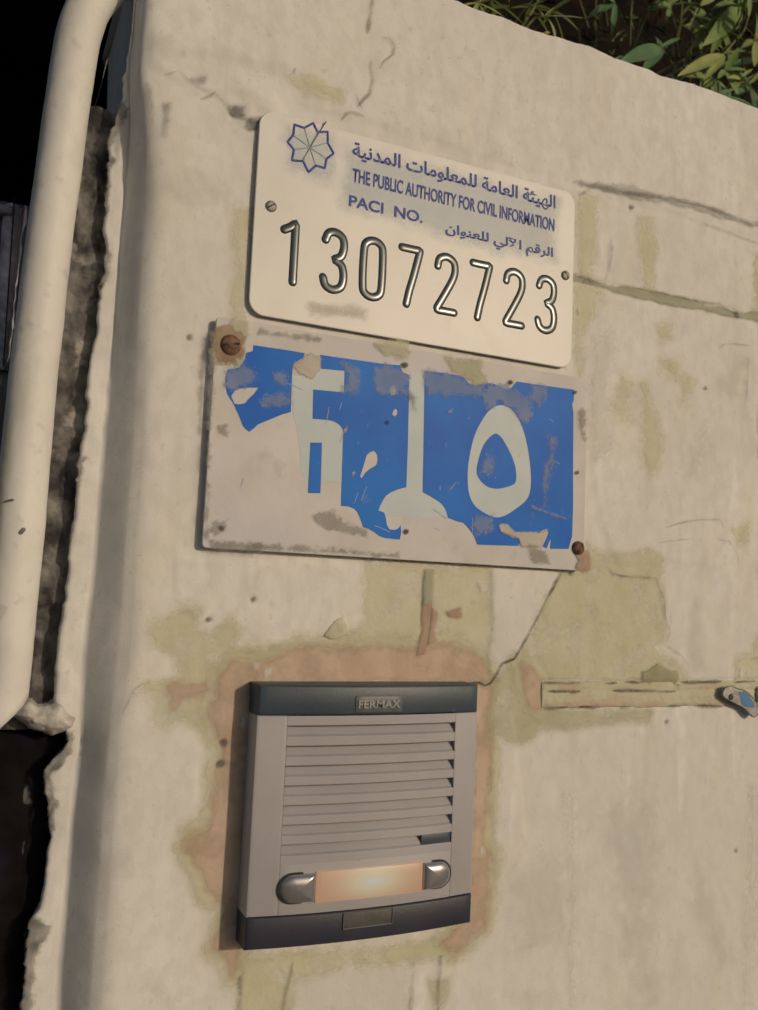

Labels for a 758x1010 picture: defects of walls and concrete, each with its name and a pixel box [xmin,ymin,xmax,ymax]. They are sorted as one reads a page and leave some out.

crack [470,573,562,686]
spalling [45,732,74,832]
peeling [169,561,653,985]
spalling [21,918,51,1010]